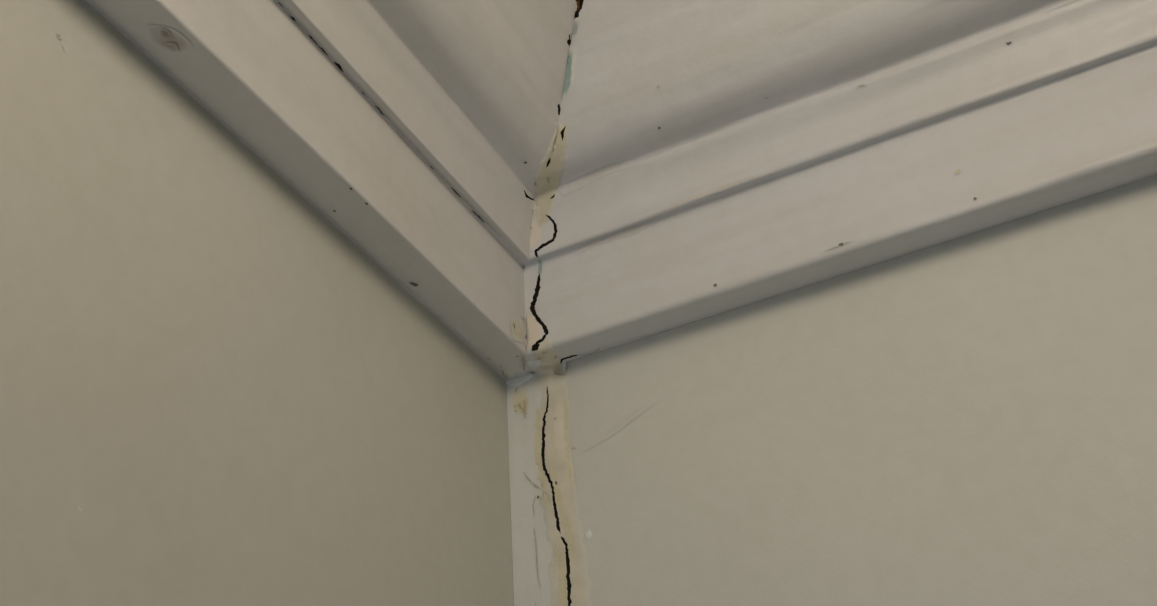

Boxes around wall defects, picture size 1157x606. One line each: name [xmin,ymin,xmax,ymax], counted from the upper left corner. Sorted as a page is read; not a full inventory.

crack [275,0,506,240]
crack [574,0,584,19]
crack [523,104,602,606]